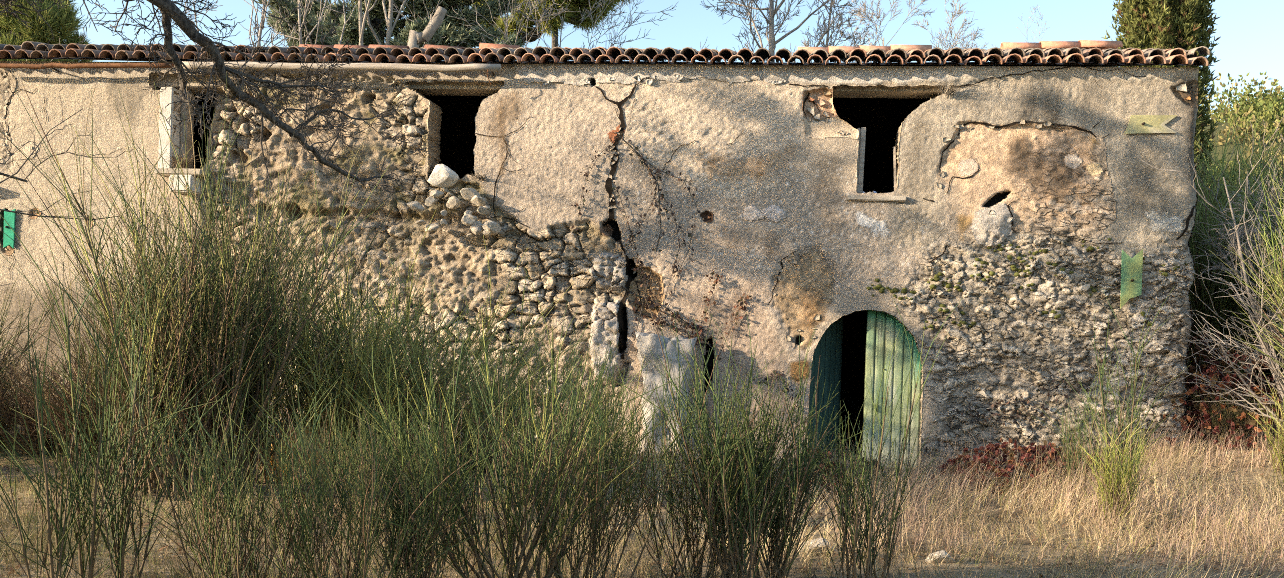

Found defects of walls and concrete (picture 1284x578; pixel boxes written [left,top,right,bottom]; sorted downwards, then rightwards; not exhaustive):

spalling [803,87,859,139]
crack [595,78,653,359]
spalling [936,118,1117,238]
spalling [775,251,833,349]